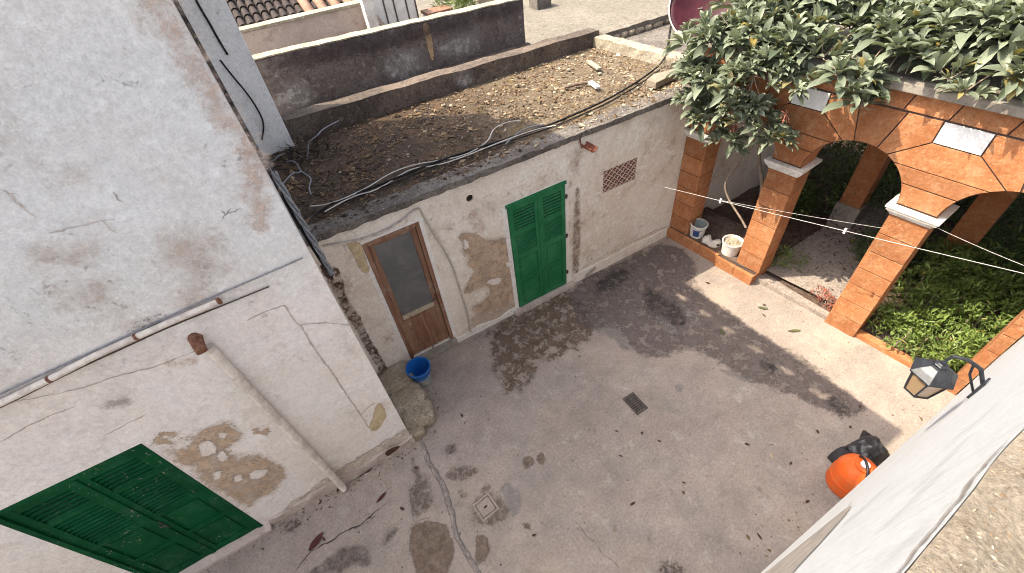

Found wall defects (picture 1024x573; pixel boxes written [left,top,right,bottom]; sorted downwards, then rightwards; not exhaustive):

peeling [150,421,286,507]
crack [249,268,387,464]
peeling [369,404,386,431]
crack [420,439,481,573]
peeling [458,233,514,315]
damp [474,188,865,416]